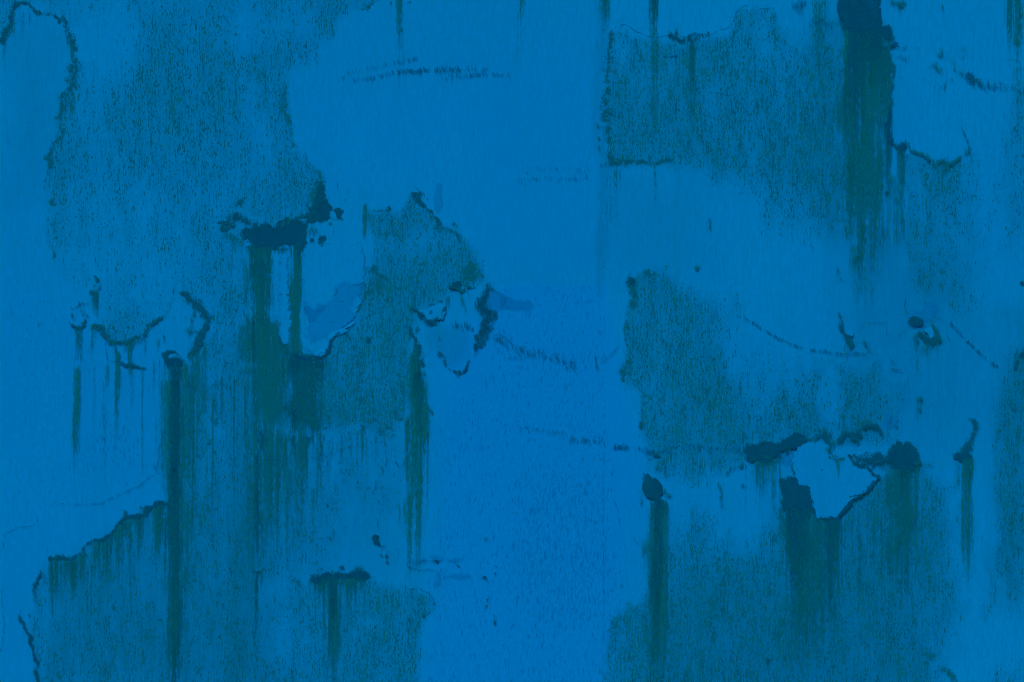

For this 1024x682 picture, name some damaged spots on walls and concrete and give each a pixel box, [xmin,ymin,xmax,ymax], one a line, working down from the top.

peeling [217,181,391,359]
peeling [411,186,462,240]
peeling [409,281,511,376]
peeling [741,422,937,578]